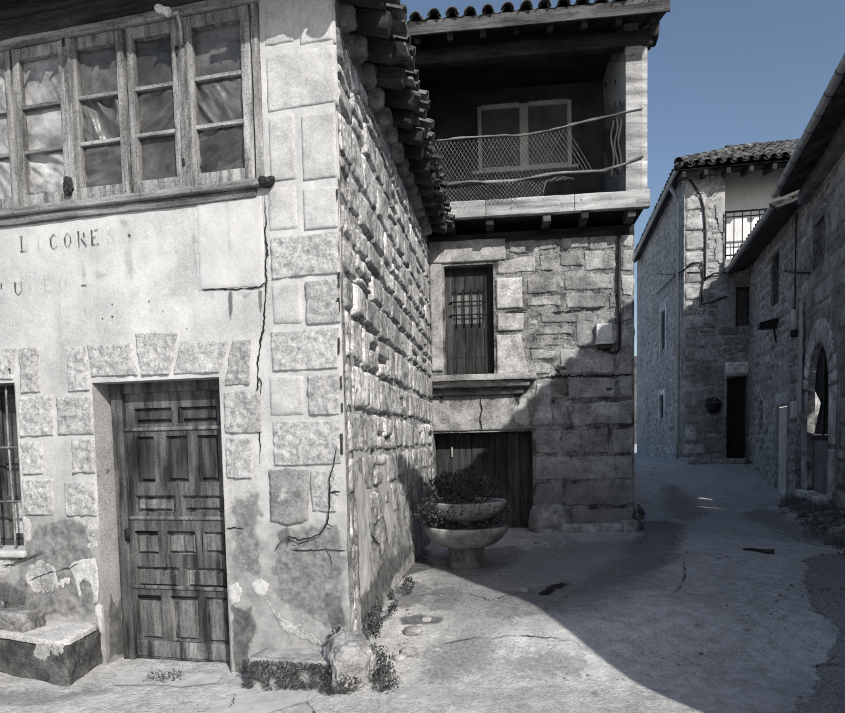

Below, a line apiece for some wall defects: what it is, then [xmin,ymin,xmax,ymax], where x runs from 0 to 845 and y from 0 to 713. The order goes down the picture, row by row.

crack [202,207,269,394]
peeling [341,393,366,427]
spalling [0,517,103,634]
spalling [229,493,345,645]
crack [275,443,345,564]
peeling [353,436,397,599]
damp [231,606,256,673]